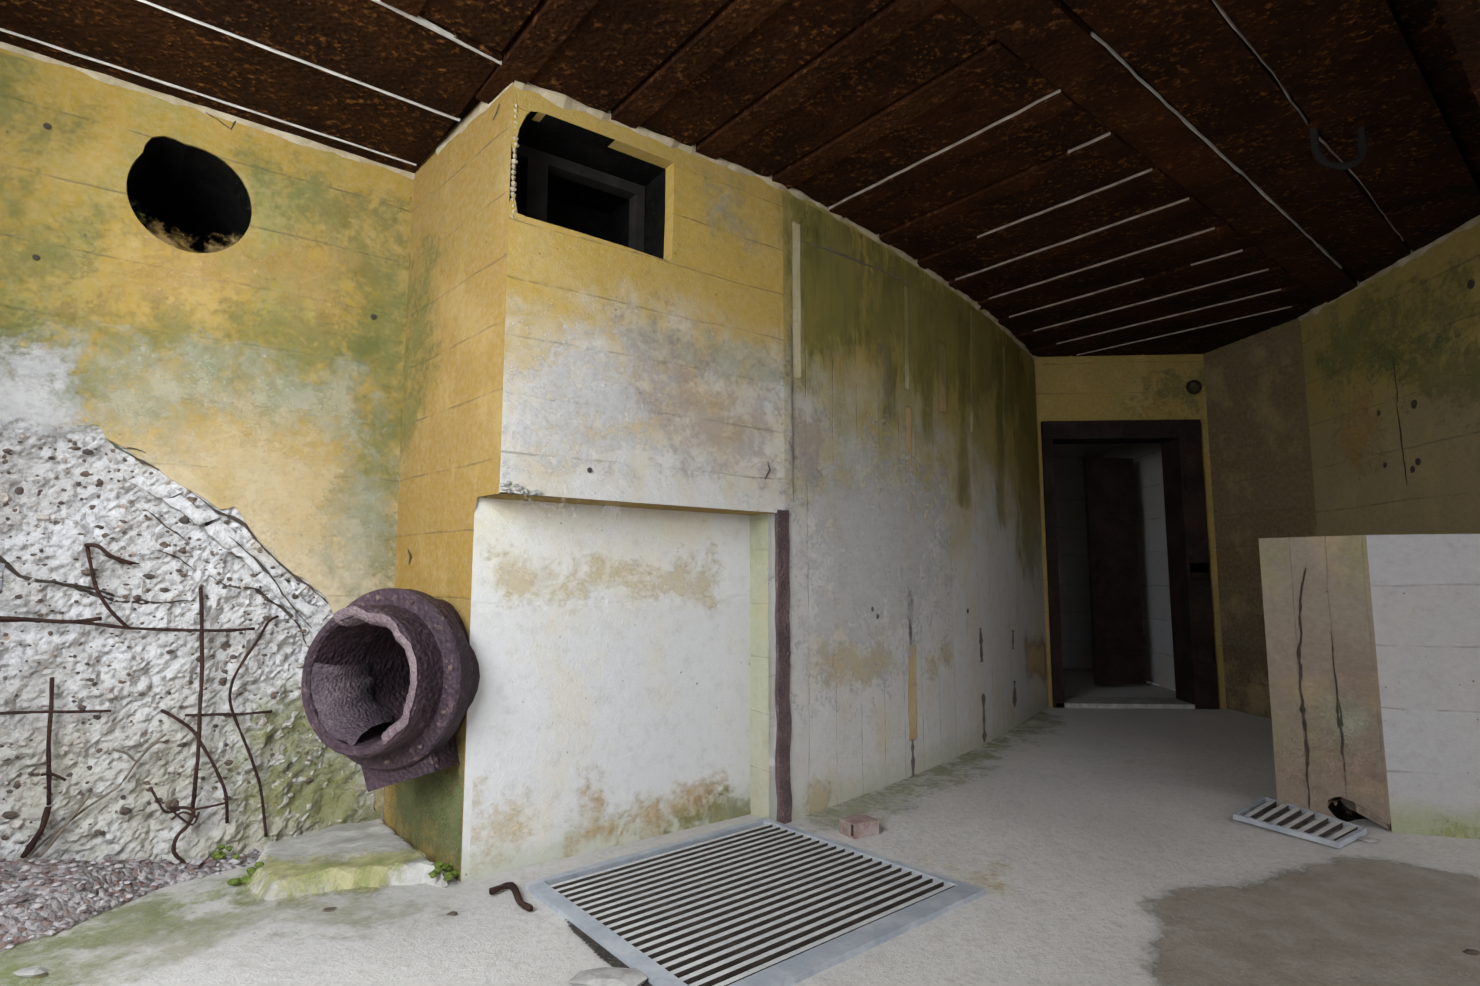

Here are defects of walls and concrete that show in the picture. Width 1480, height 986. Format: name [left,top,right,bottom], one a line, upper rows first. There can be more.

water stain [0,28,416,166]
water stain [792,222,801,379]
water stain [0,330,83,433]
water stain [882,304,973,546]
spalling [0,419,383,866]
water stain [908,646,917,740]
crack [1296,568,1346,808]